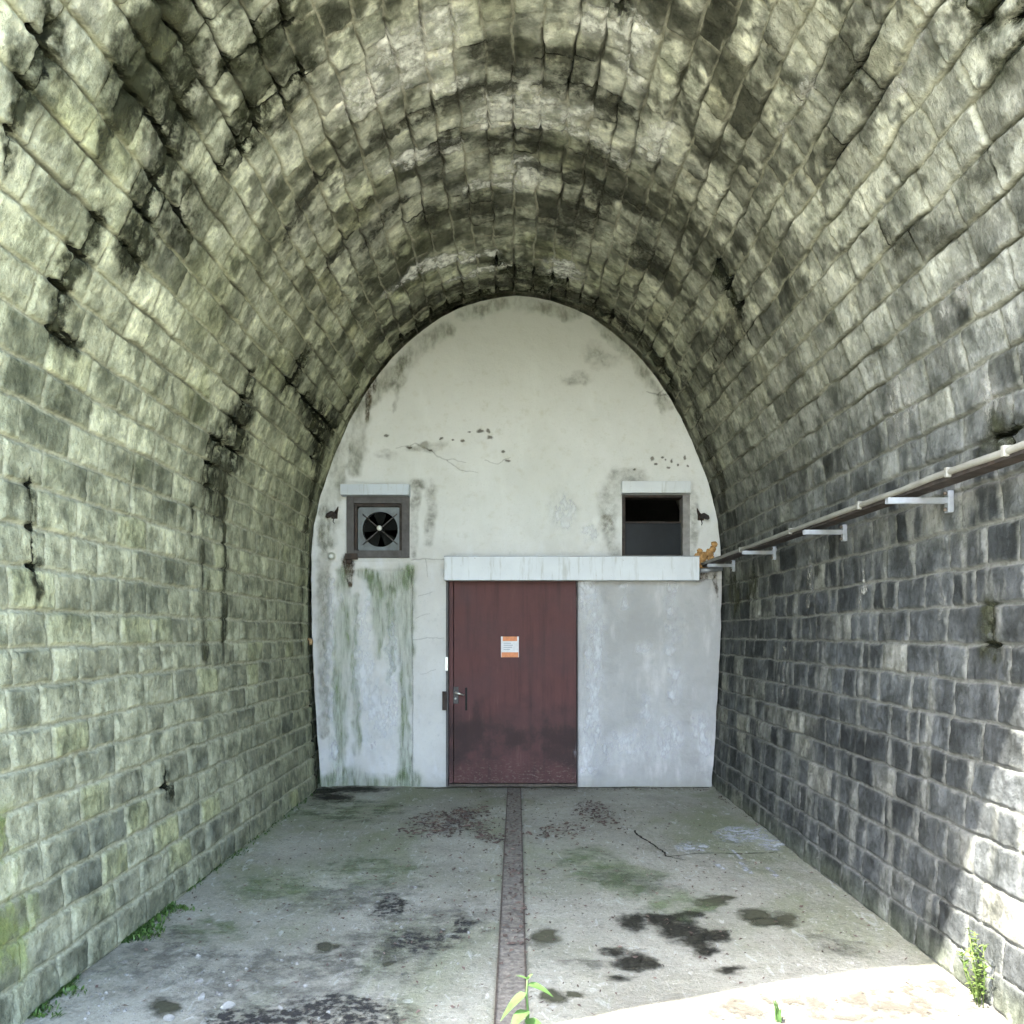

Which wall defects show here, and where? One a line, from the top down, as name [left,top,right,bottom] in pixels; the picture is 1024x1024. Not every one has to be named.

crack [44,0,317,358]
crack [710,255,746,320]
crack [280,346,339,466]
crack [23,478,45,609]
water stain [332,630,407,742]
crack [634,830,696,860]